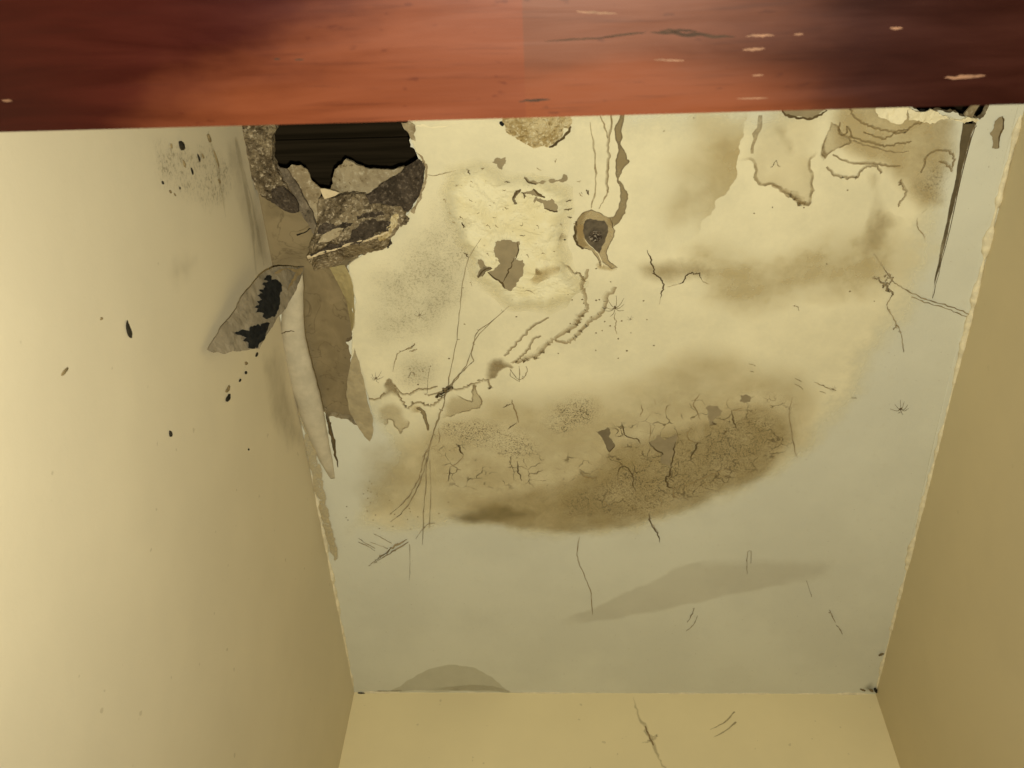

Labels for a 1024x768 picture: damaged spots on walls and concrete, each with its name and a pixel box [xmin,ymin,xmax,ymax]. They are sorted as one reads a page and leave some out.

flaking render [499,117,572,162]
crack [917,123,977,298]
peeling [207,121,448,441]
peeling [464,224,529,291]
leakage [349,109,955,531]
crack [647,250,707,304]
crack [438,428,464,480]
crack [581,394,742,542]
crack [577,537,593,615]